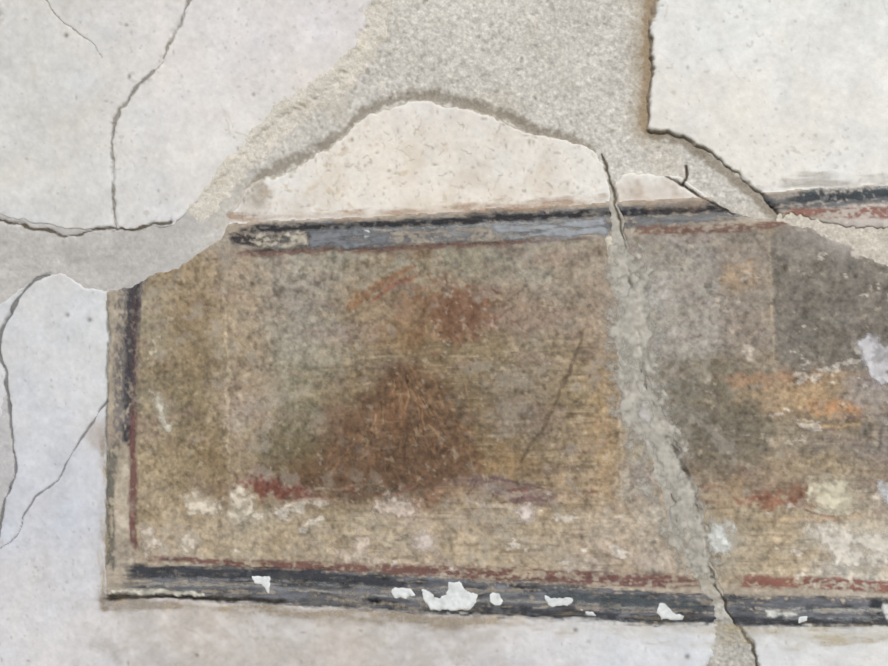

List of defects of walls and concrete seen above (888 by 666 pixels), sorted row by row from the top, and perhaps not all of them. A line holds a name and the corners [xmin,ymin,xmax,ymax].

crack [111,0,191,149]
spalling [0,0,888,304]
crack [0,184,172,237]
crack [0,275,108,545]
crack [601,153,759,666]
peeling [391,581,478,612]
peeling [490,592,503,606]
peeling [545,595,596,616]
peeling [657,603,684,620]